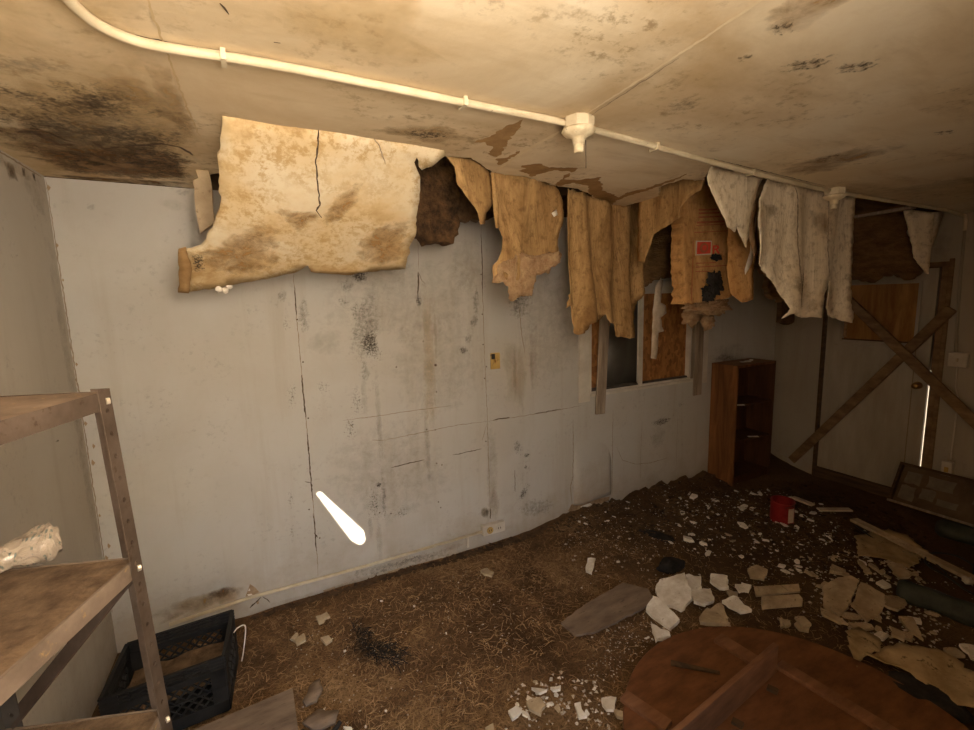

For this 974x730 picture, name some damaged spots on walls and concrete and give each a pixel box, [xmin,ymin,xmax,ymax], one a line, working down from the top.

water stain [0,0,200,178]
crack [314,130,322,218]
spalling [178,247,192,293]